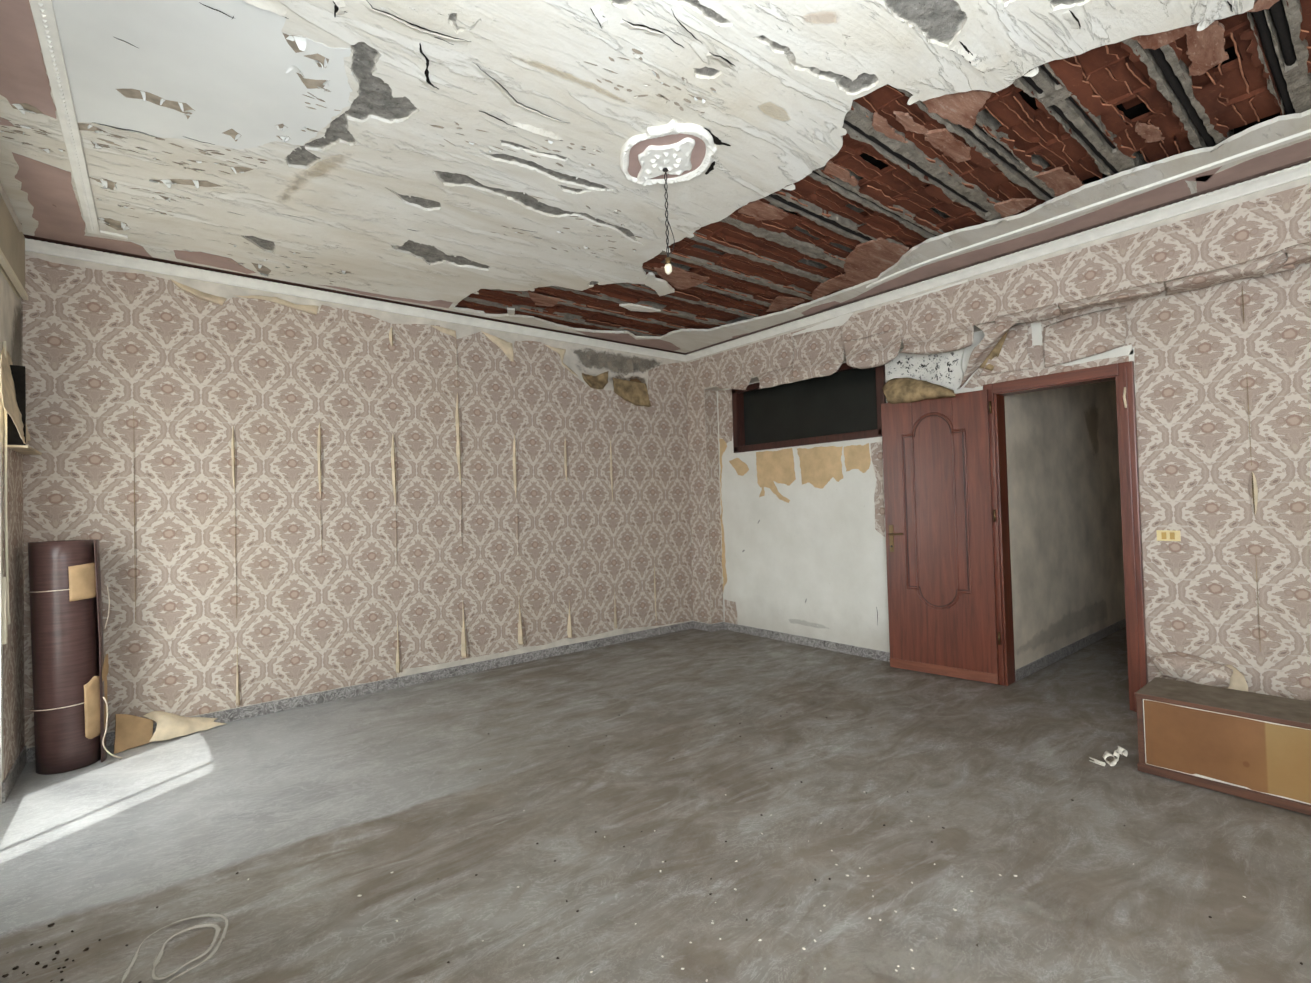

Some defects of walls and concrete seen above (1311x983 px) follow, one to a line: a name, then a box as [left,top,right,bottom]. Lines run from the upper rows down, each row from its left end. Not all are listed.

crack [199,0,291,19]
flaking render [679,0,730,27]
flaking render [885,0,967,48]
crack [332,0,570,141]
peeling [584,49,723,113]
flaking render [757,35,878,93]
peeling [0,103,65,154]
crack [92,122,215,145]
flaking render [431,122,642,258]